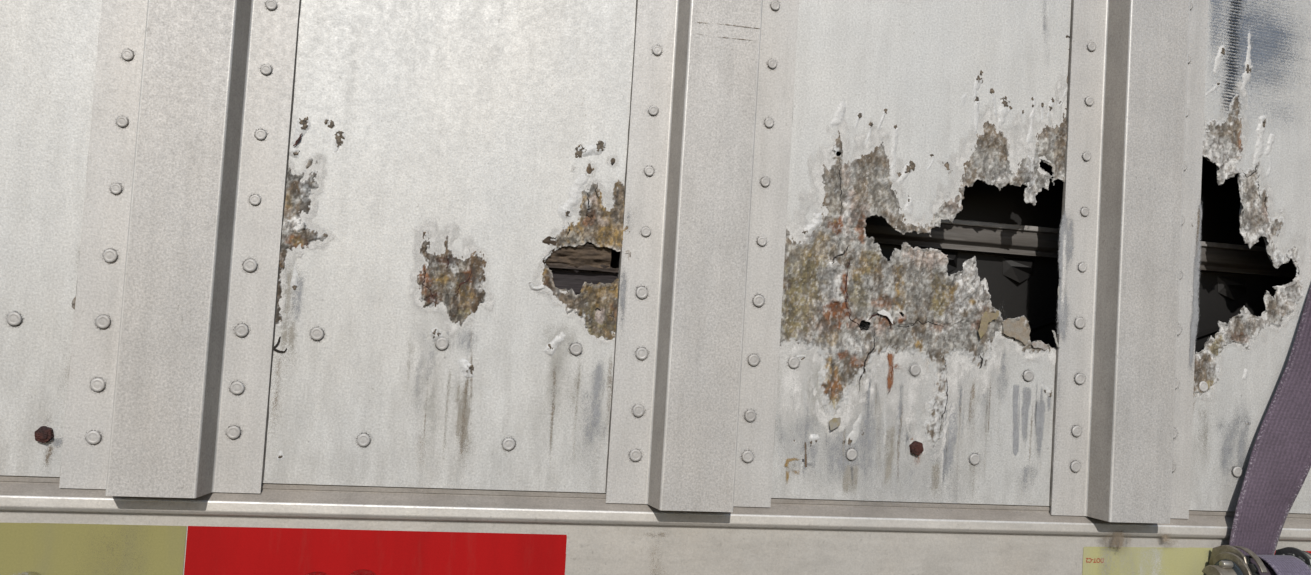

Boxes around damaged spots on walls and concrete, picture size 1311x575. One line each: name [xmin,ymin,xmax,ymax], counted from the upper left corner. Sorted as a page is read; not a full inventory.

rust [408,217,495,336]
rust [779,71,1068,464]
damp [1055,208,1075,345]
damp [398,322,478,474]
damp [773,337,1062,510]